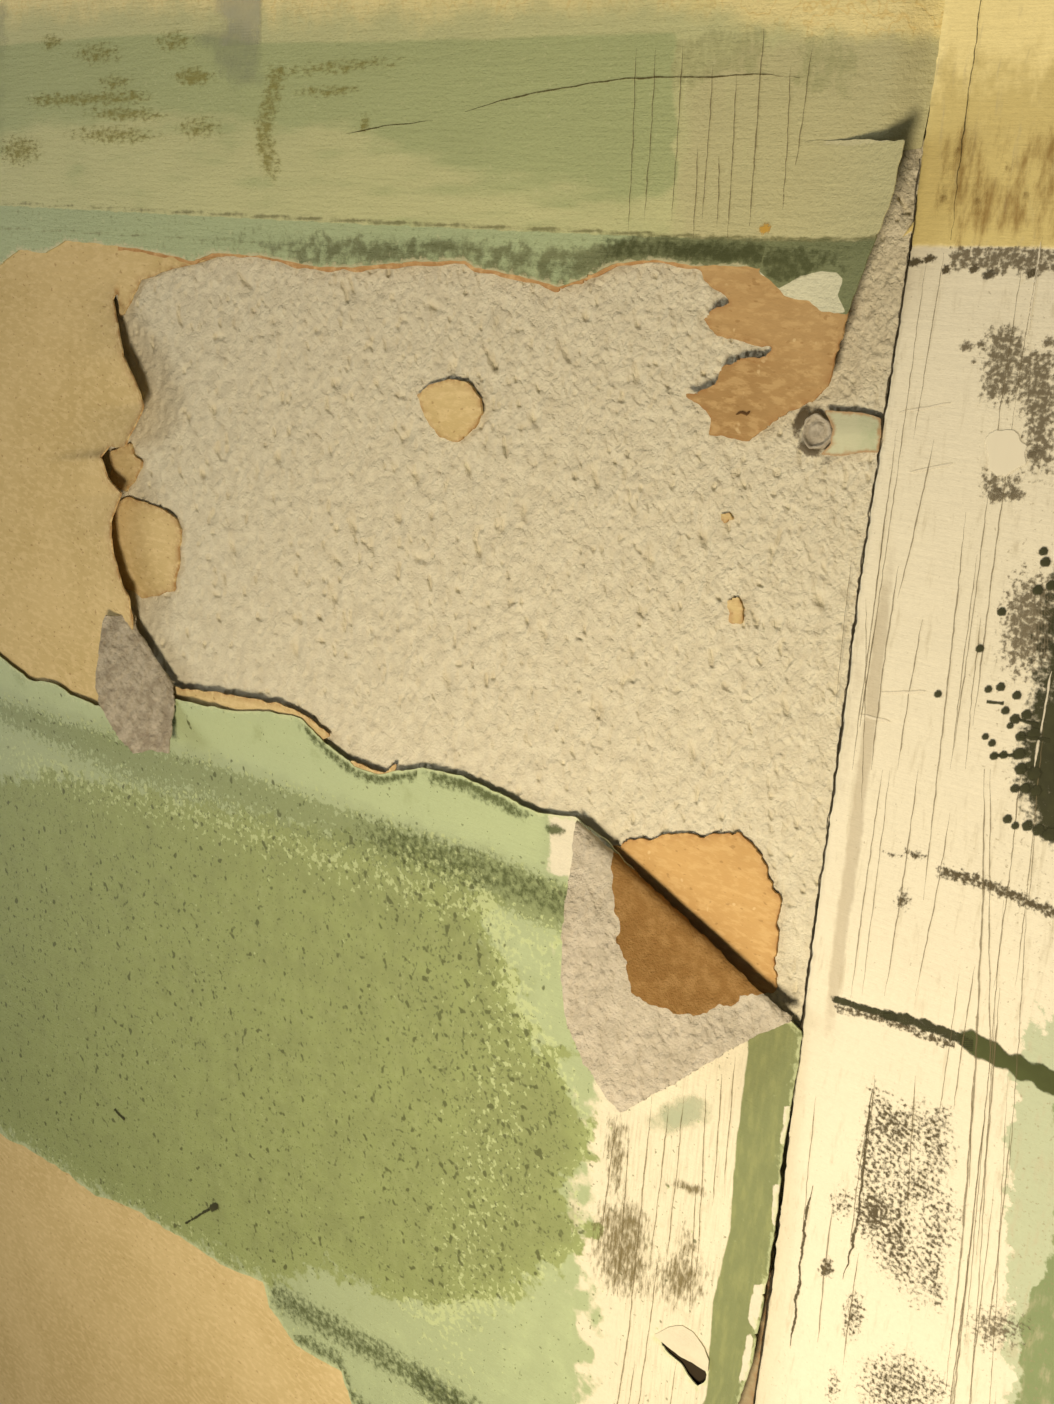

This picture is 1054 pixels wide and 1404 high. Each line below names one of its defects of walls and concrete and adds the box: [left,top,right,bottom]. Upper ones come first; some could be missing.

crack [347,120,431,134]
crack [465,74,799,112]
water stain [908,246,1054,280]
water stain [960,325,1054,504]
spalling [0,0,945,1029]
crack [800,159,921,1048]
water stain [982,547,1054,843]
peeling [0,656,802,1404]
crack [753,1269,773,1404]
water stain [790,1186,813,1346]
water stain [818,1088,960,1310]
water stain [858,1354,950,1404]